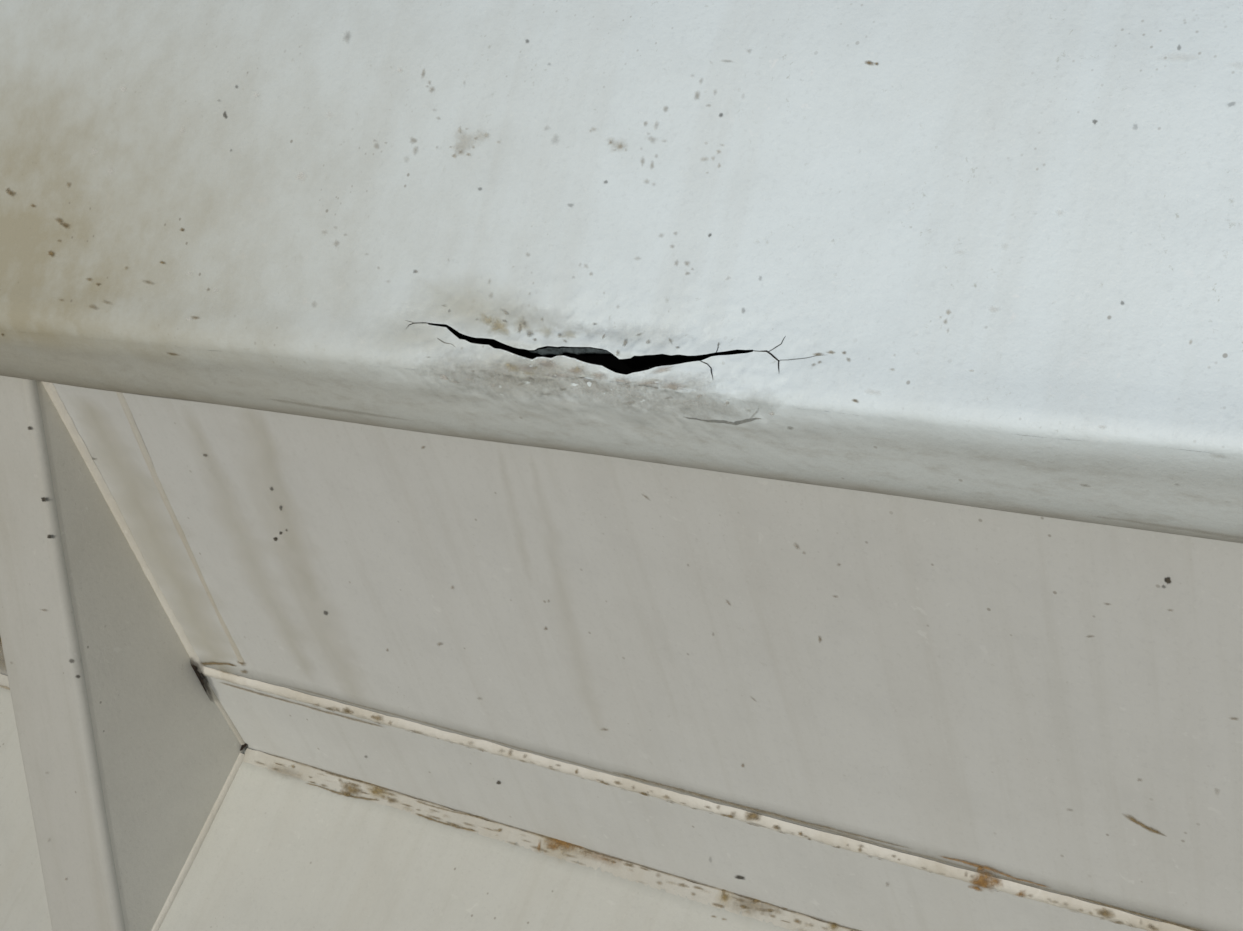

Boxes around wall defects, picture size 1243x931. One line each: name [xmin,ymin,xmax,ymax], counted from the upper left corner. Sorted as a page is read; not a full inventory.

crack [406,320,821,379]